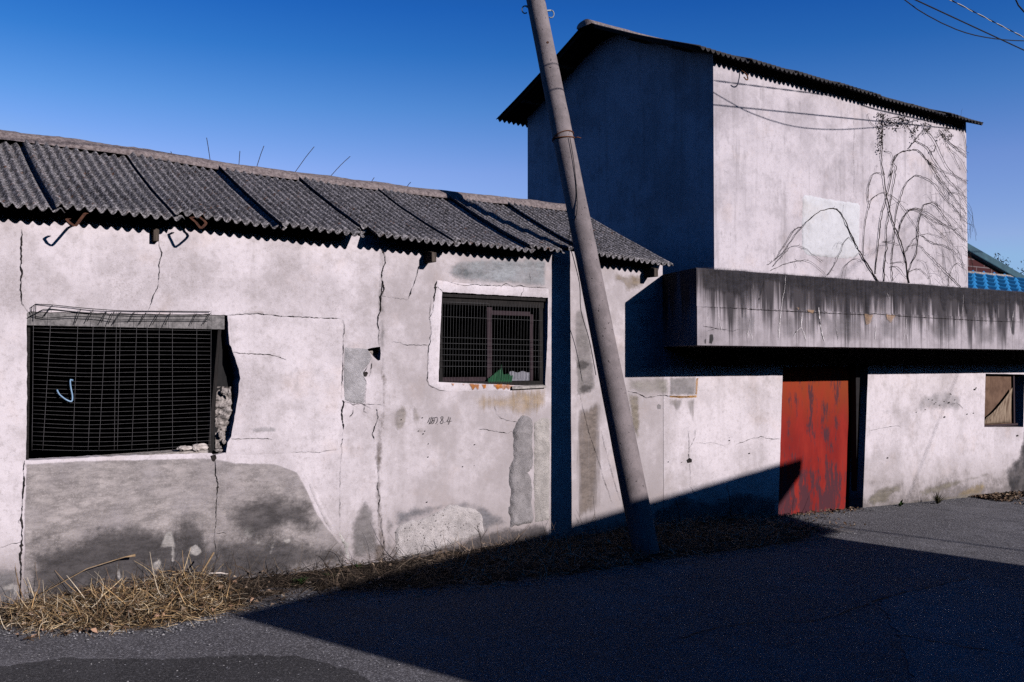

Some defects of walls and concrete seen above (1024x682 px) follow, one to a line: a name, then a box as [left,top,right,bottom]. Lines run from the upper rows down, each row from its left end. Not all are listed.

spalling [211,386,232,461]
crack [308,241,545,505]
leakage [704,269,1024,341]
crack [4,462,25,606]
leakage [0,459,384,608]
crack [215,462,224,558]